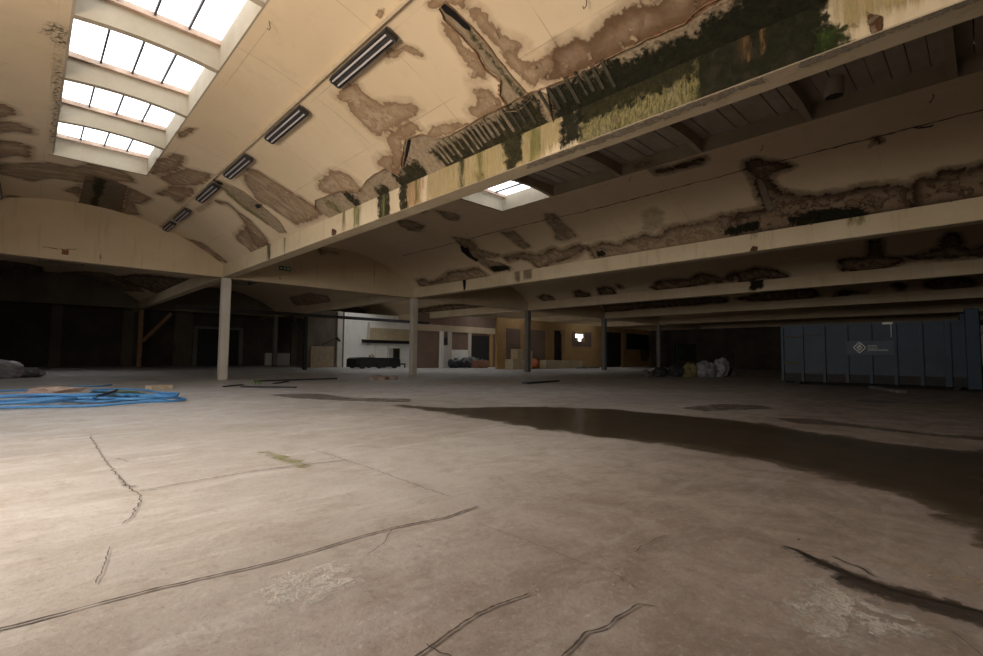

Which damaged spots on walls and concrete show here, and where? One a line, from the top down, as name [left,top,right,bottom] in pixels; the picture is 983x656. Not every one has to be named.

water stain [427,0,697,86]
water stain [337,22,503,174]
water stain [501,128,540,170]
spalling [315,0,827,235]
water stain [559,108,584,149]
water stain [398,219,425,232]
crack [90,437,142,524]
crack [783,545,983,656]